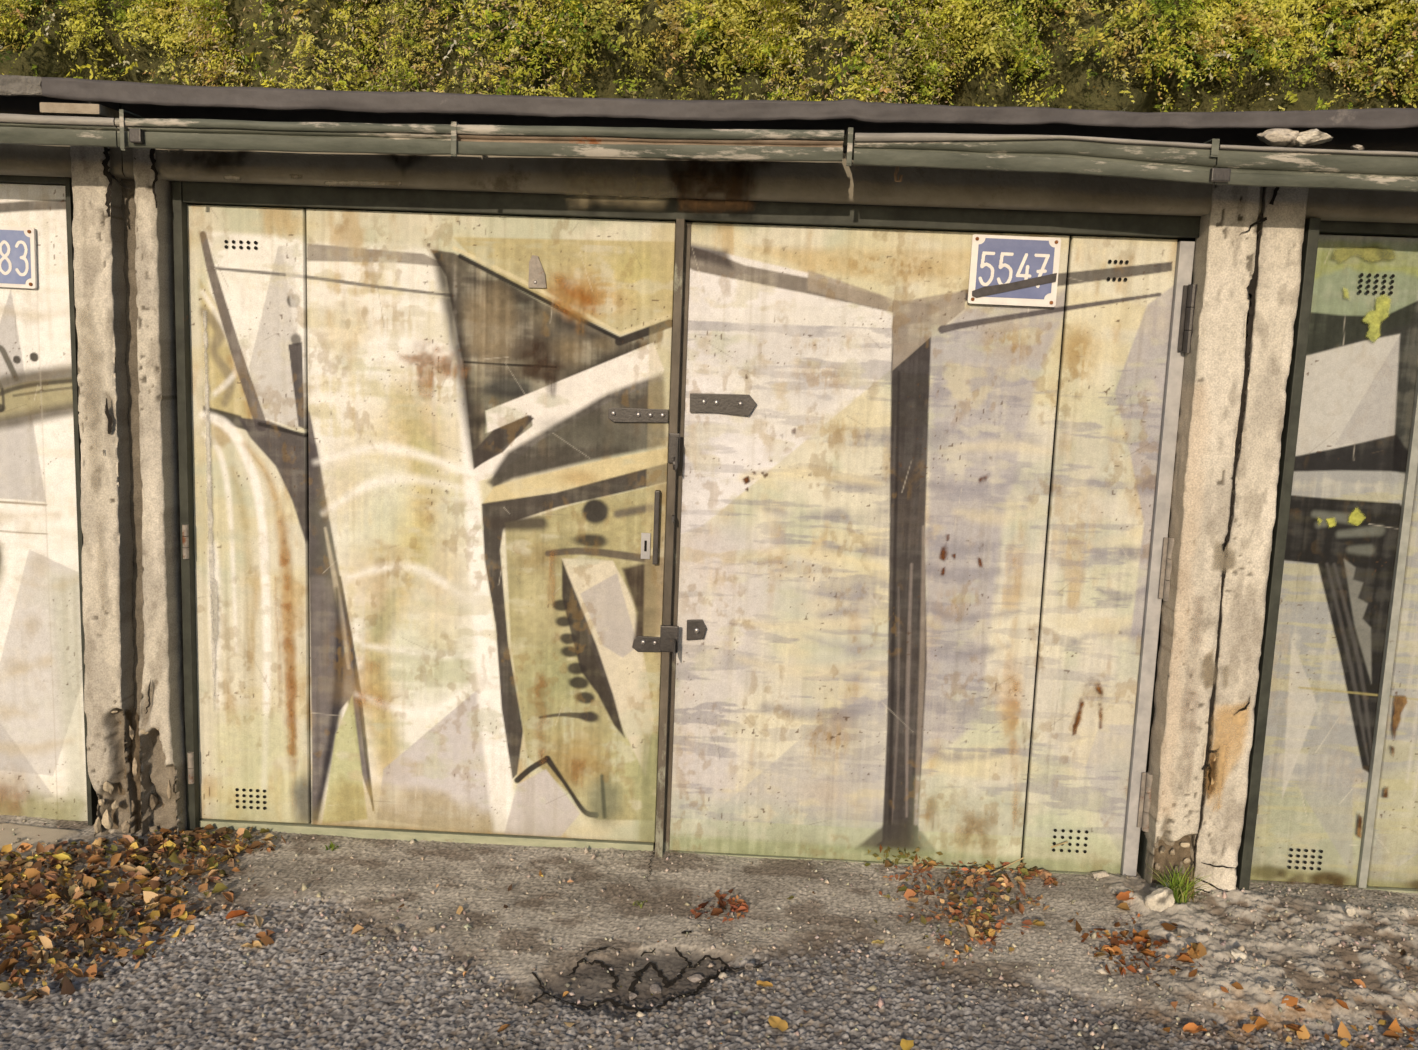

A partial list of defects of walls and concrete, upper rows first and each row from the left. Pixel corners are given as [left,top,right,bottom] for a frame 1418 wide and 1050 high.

crack [1192,187,1279,893]
spalling [94,708,171,834]
corrosion [1073,702,1084,735]
spalling [1206,747,1219,799]